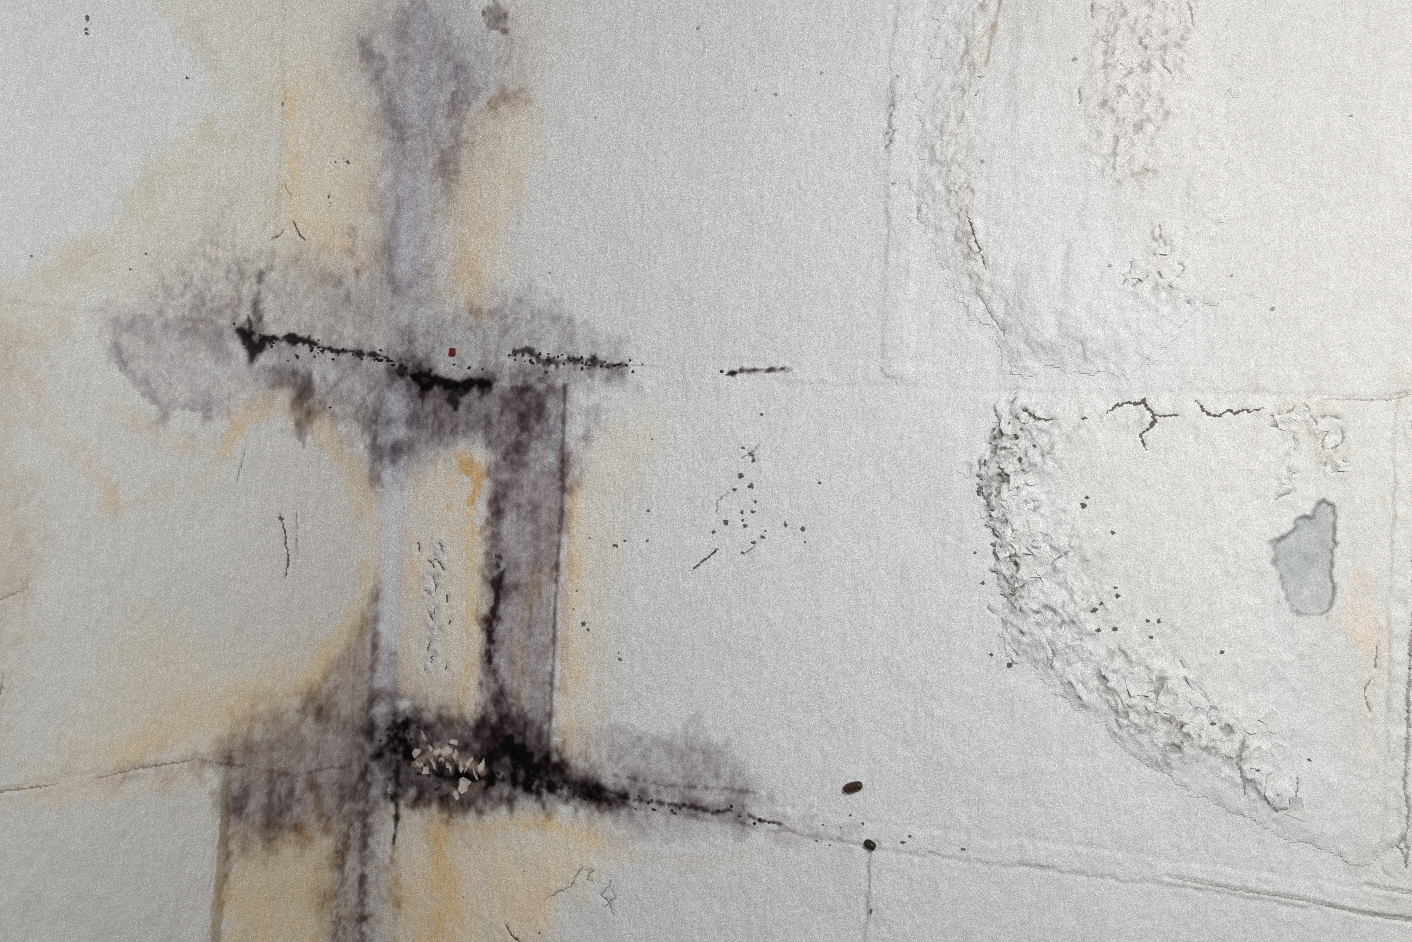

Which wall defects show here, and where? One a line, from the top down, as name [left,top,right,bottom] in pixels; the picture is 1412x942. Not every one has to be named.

rust [280,63,374,269]
leakage [0,0,866,942]
rust [397,442,488,717]
spalling [956,385,1311,822]
crack [1106,397,1264,450]
spalling [1277,496,1341,614]